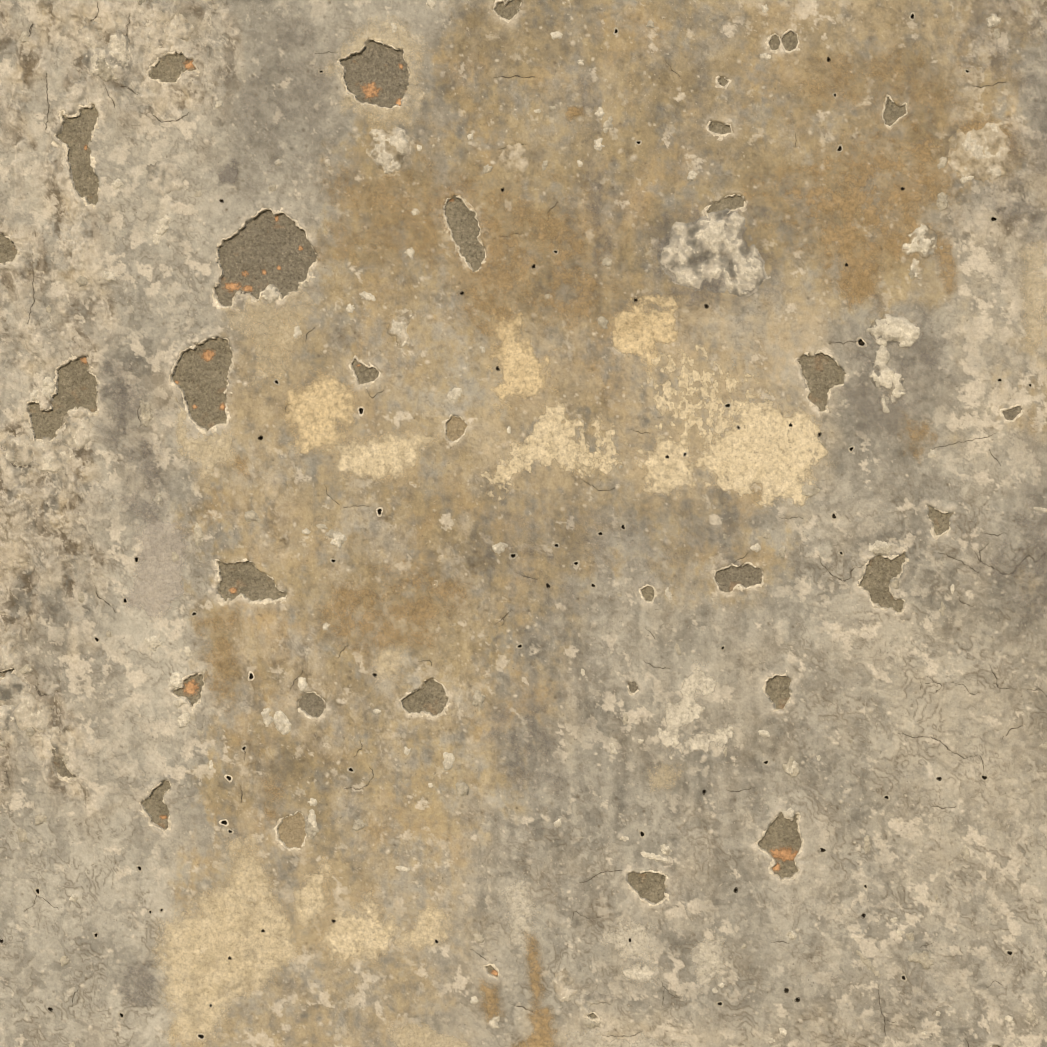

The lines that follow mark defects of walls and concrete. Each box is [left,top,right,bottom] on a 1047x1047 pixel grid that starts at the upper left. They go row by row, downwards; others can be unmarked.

spalling [330,25,421,119]
spalling [51,102,101,209]
water stain [219,161,238,183]
spalling [210,207,317,310]
spalling [441,195,487,272]
spalling [168,337,236,475]
peeling [612,295,849,506]
spalling [215,558,287,606]
spalling [856,549,909,621]
spalling [399,678,450,720]
spalling [754,812,804,881]